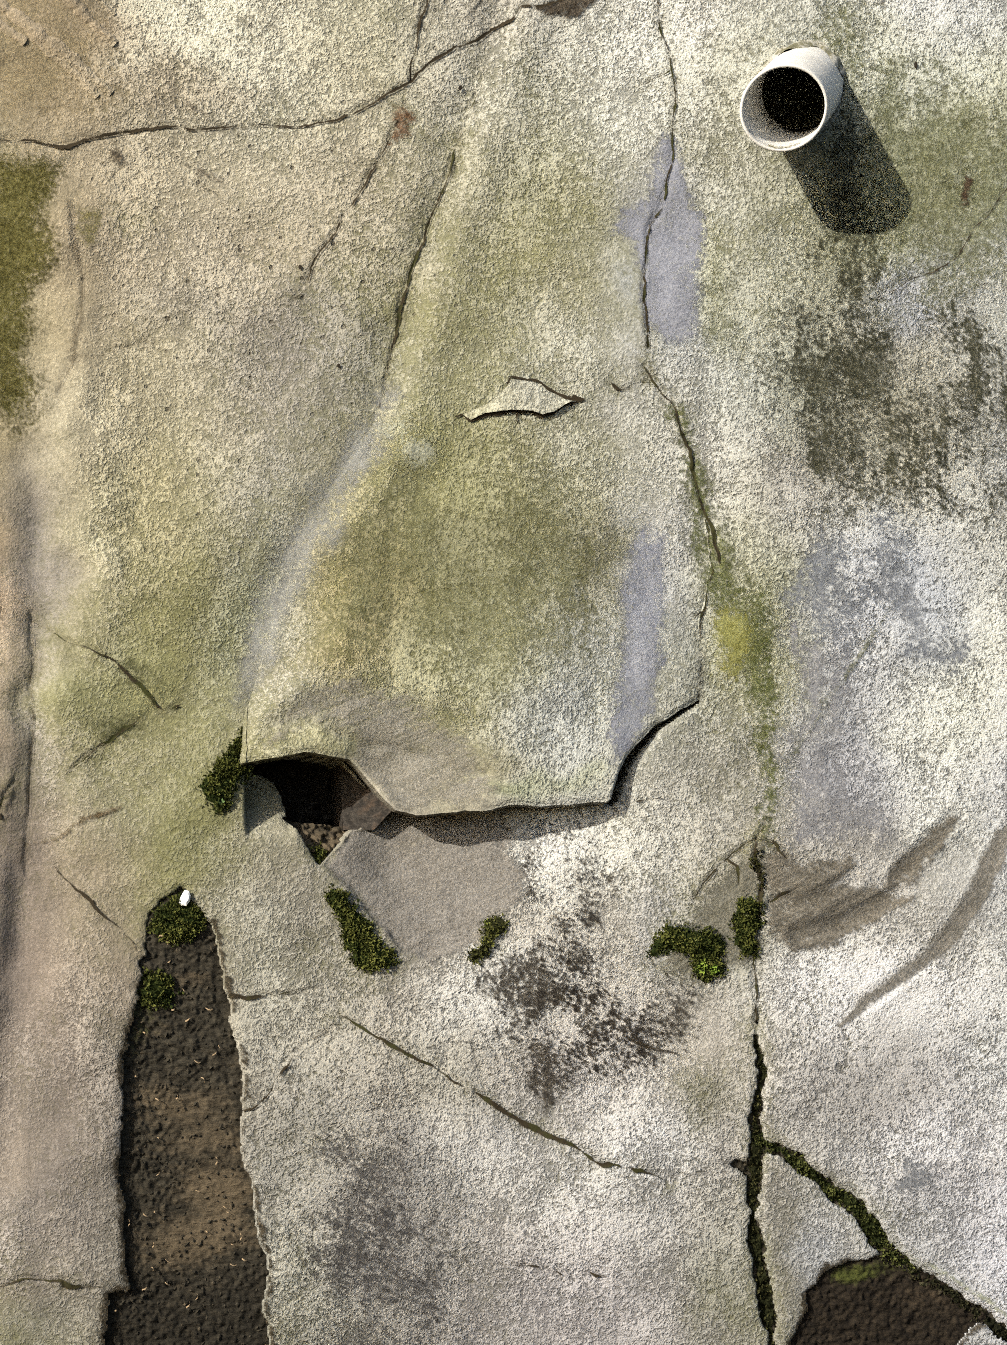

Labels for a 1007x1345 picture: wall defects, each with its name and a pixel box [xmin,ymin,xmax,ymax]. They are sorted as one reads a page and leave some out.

crack [0,0,563,298]
crack [371,94,478,389]
crack [611,0,720,639]
damp [754,105,1007,528]
crack [24,865,137,952]
crack [0,621,183,807]
spalling [251,679,527,961]
spalling [99,886,275,1345]
crack [242,1016,694,1179]
crack [696,820,1007,1345]
crack [0,1278,100,1289]
spalling [786,1244,986,1345]